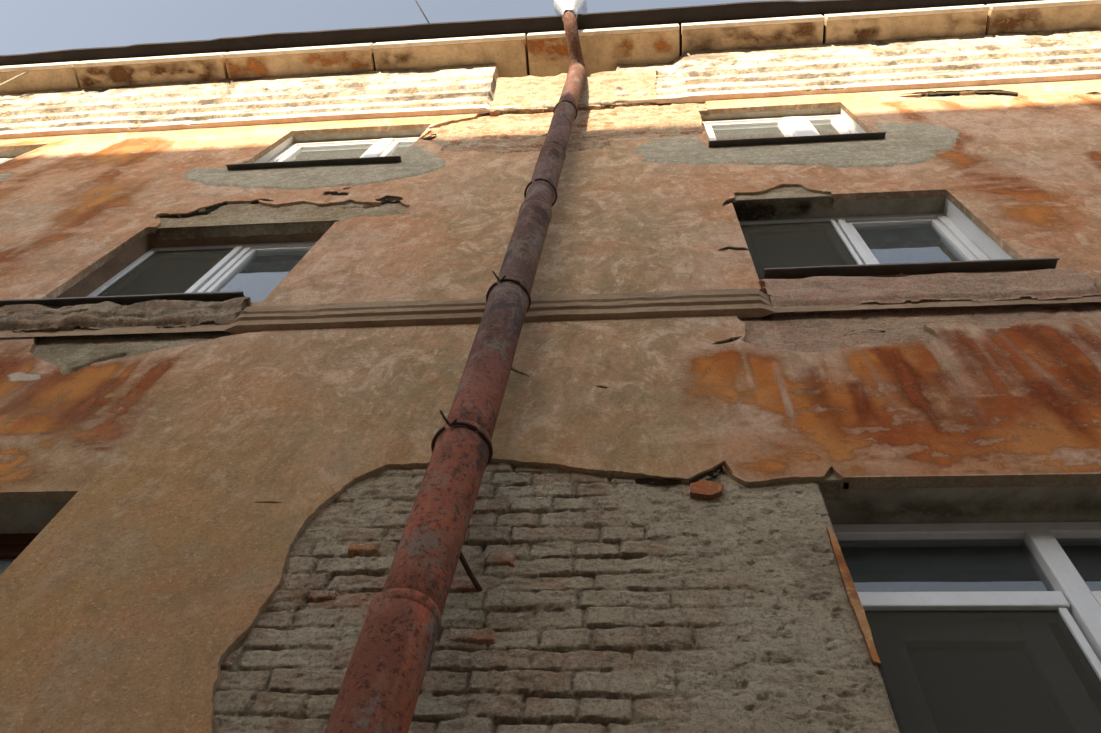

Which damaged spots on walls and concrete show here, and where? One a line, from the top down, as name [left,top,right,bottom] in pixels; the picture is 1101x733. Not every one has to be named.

flaking render [423,111,554,154]
flaking render [566,102,708,152]
peeling [7,372,41,381]
rust [0,349,177,487]
flaking render [32,331,236,374]
rust [689,325,1101,474]
flaking render [212,468,427,733]
flaking render [408,463,900,733]